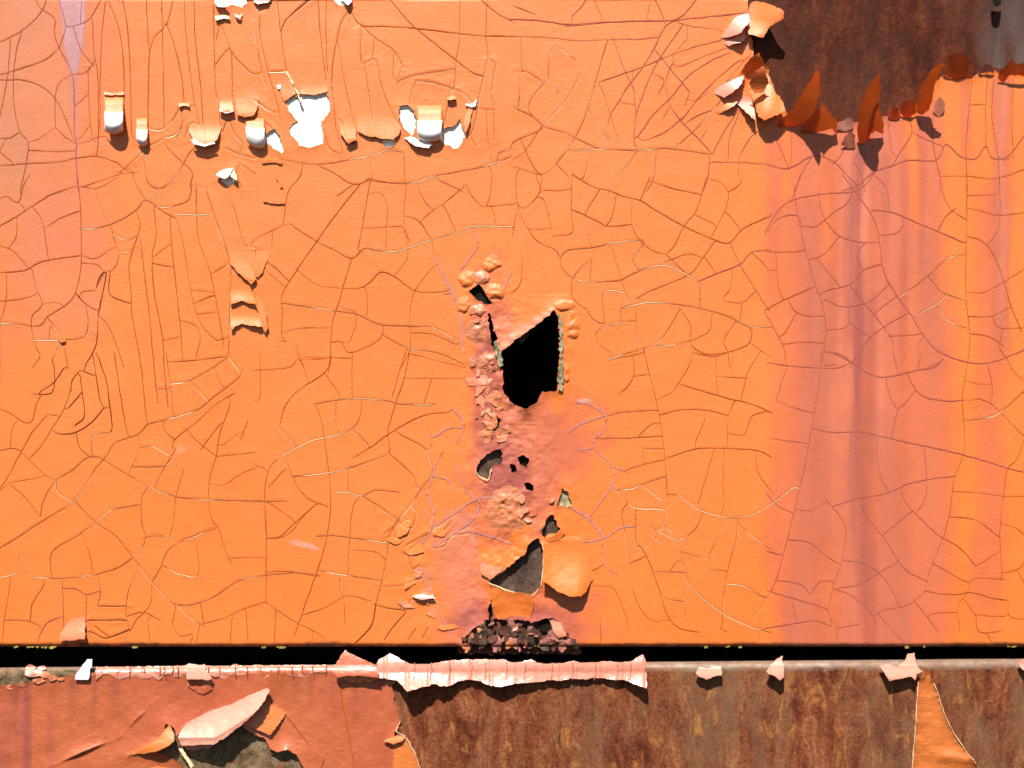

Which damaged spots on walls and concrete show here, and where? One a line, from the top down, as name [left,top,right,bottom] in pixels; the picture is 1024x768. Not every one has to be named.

crack [147,1,184,114]
crack [213,0,310,128]
peeling [179,71,477,164]
crack [318,0,504,154]
peeling [210,168,270,333]
rust [202,0,1024,656]
peeling [480,482,594,633]
crack [86,610,160,639]
peeling [75,644,647,768]
rust [392,671,917,768]
peeling [879,646,926,681]
rust [931,669,1024,768]